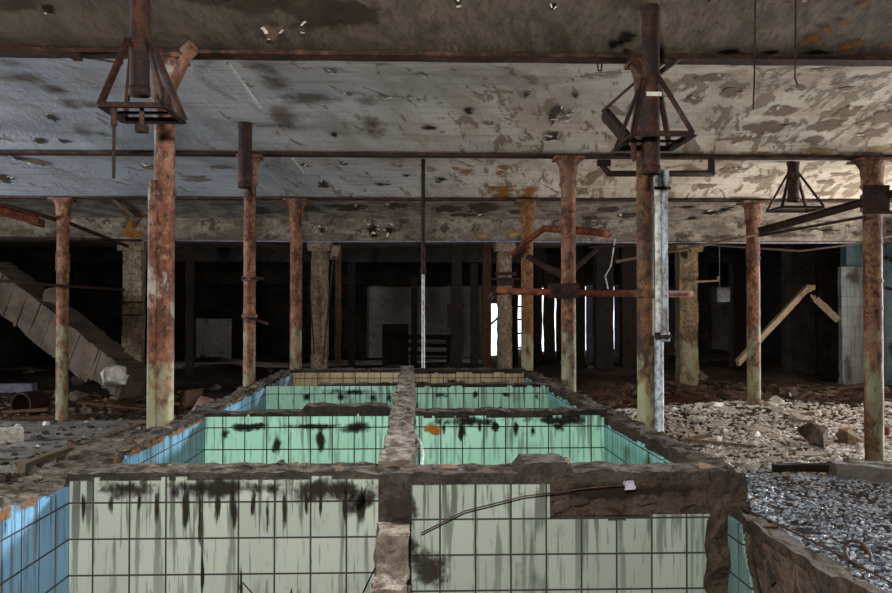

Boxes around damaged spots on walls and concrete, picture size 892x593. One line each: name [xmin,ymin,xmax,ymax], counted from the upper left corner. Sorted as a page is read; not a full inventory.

peeling [695,74,747,98]
spalling [545,105,575,142]
peeling [714,103,892,145]
rust [484,182,538,199]
peeling [812,173,854,196]
damp [435,416,499,441]
damp [513,415,585,435]
rust [0,496,37,521]
damp [101,483,159,519]
damp [172,477,376,545]
damp [571,483,700,499]
spalling [745,532,817,593]